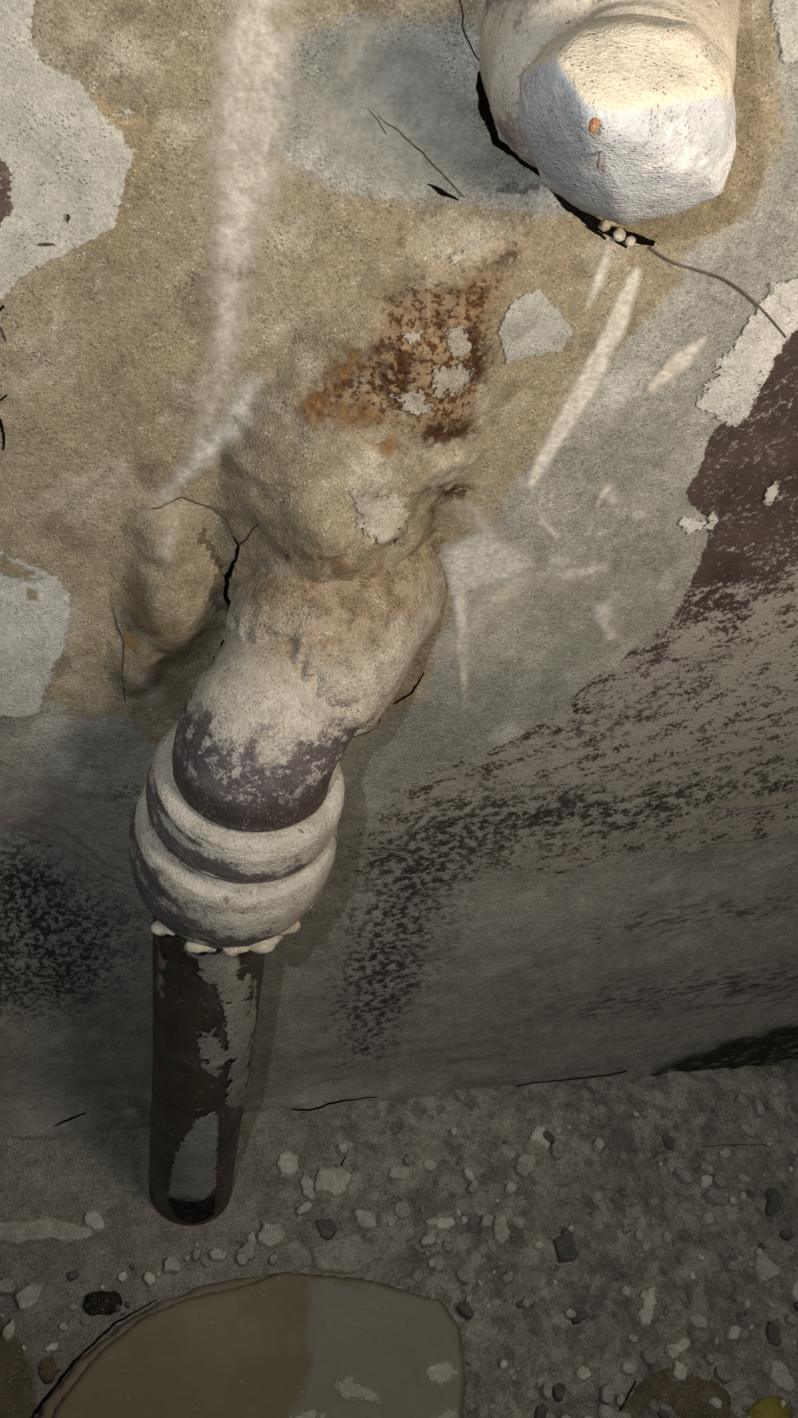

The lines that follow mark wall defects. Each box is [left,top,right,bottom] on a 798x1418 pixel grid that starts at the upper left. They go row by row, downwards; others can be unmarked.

damp [330,50,470,161]
damp [215,0,290,390]
crack [0,394,8,450]
spalling [0,0,490,749]
corrosion [303,275,498,442]
spalling [367,0,798,734]
crack [151,496,258,659]
corrosion [350,484,467,545]
damp [443,515,535,703]
damp [0,860,113,1009]
damp [344,778,798,1055]
crack [619,1381,637,1411]